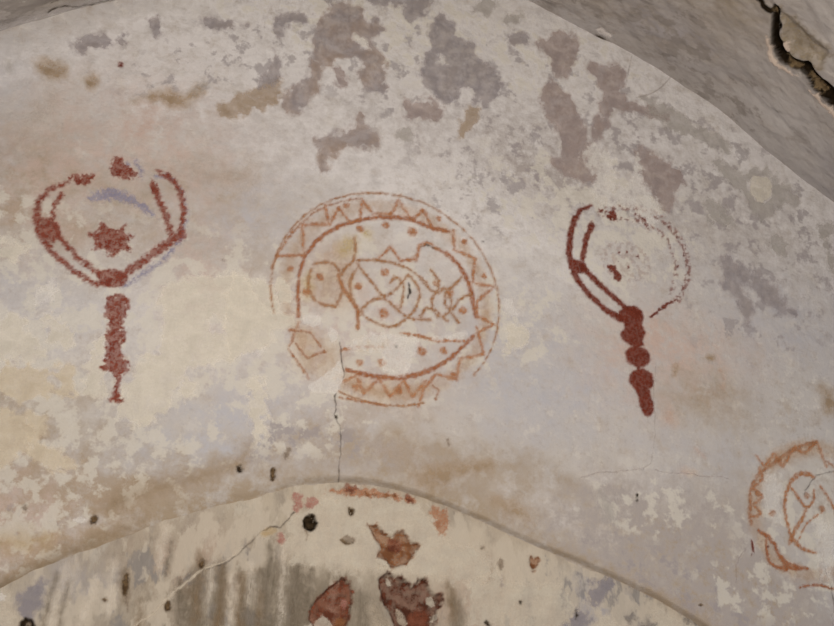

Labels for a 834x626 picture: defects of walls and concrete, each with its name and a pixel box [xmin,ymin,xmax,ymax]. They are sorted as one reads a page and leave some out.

peeling [75,34,127,54]
peeling [149,15,160,38]
peeling [204,17,233,30]
peeling [218,0,388,117]
peeling [368,0,501,141]
peeling [505,13,730,182]
crack [757,0,834,117]
peeling [313,112,379,172]
peeling [635,147,685,212]
flaking render [309,578,354,626]
flaking render [369,524,444,626]